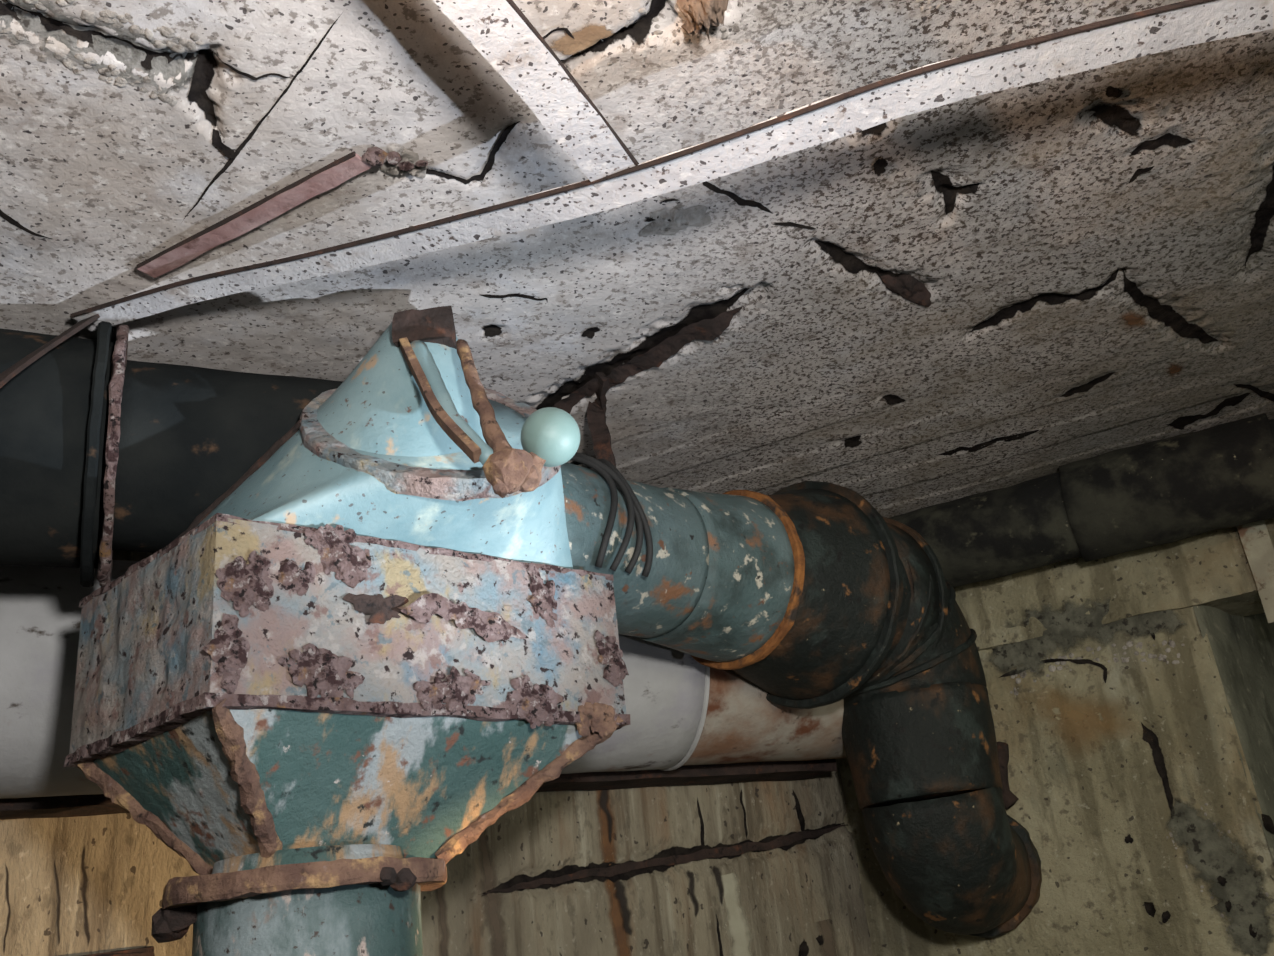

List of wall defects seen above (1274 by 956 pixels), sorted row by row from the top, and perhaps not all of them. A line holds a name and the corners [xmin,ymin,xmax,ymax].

spalling [543,0,729,69]
crack [0,0,340,219]
spalling [859,122,887,137]
spalling [1105,86,1122,98]
spalling [873,157,888,176]
spalling [931,171,979,215]
crack [0,209,52,239]
crack [1141,722,1178,822]
crack [696,797,704,844]
crack [740,790,748,839]
crack [793,791,805,831]
corrosion [597,790,630,956]